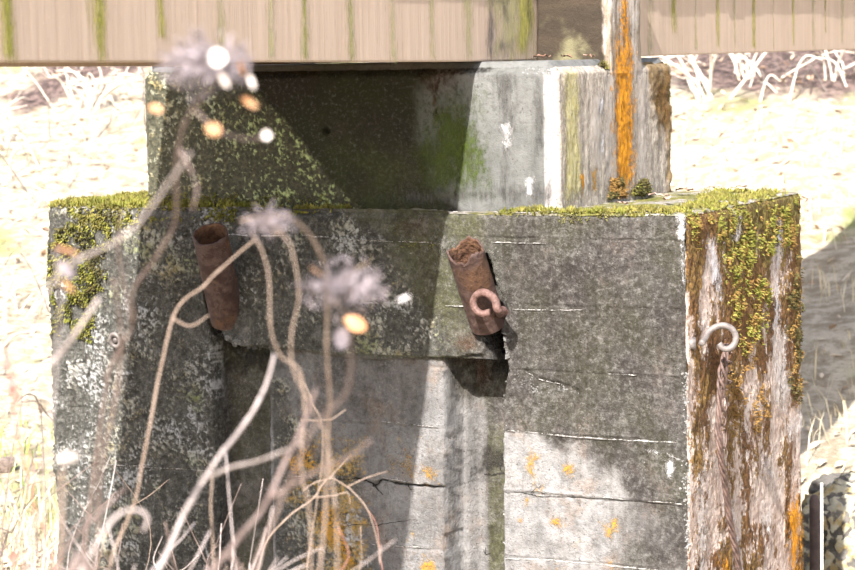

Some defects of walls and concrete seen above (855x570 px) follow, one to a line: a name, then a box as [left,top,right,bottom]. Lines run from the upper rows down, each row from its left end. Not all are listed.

damp [503,179,550,199]
crack [282,475,442,495]